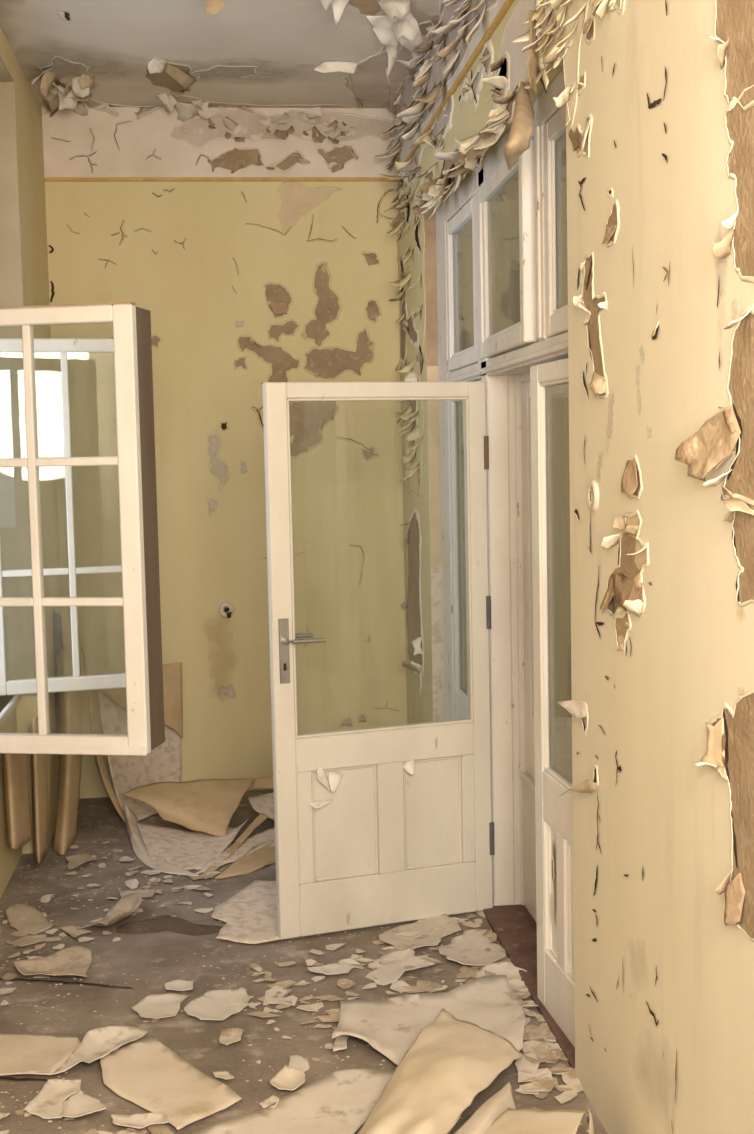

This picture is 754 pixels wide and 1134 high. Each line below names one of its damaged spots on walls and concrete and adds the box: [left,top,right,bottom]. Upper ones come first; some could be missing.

peeling [31,0,626,382]
peeling [706,0,754,283]
peeling [289,401,340,459]
peeling [394,400,424,697]
peeling [600,510,649,657]
peeling [621,459,638,495]
peeling [675,304,754,607]
peeling [695,688,754,942]